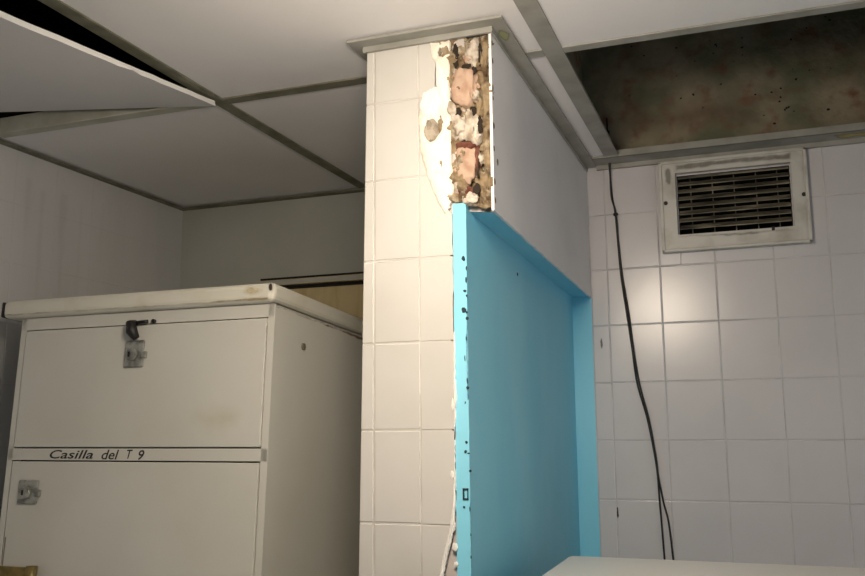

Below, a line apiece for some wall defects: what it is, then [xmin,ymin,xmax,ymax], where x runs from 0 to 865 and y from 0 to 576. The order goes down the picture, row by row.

spalling [418,34,498,214]